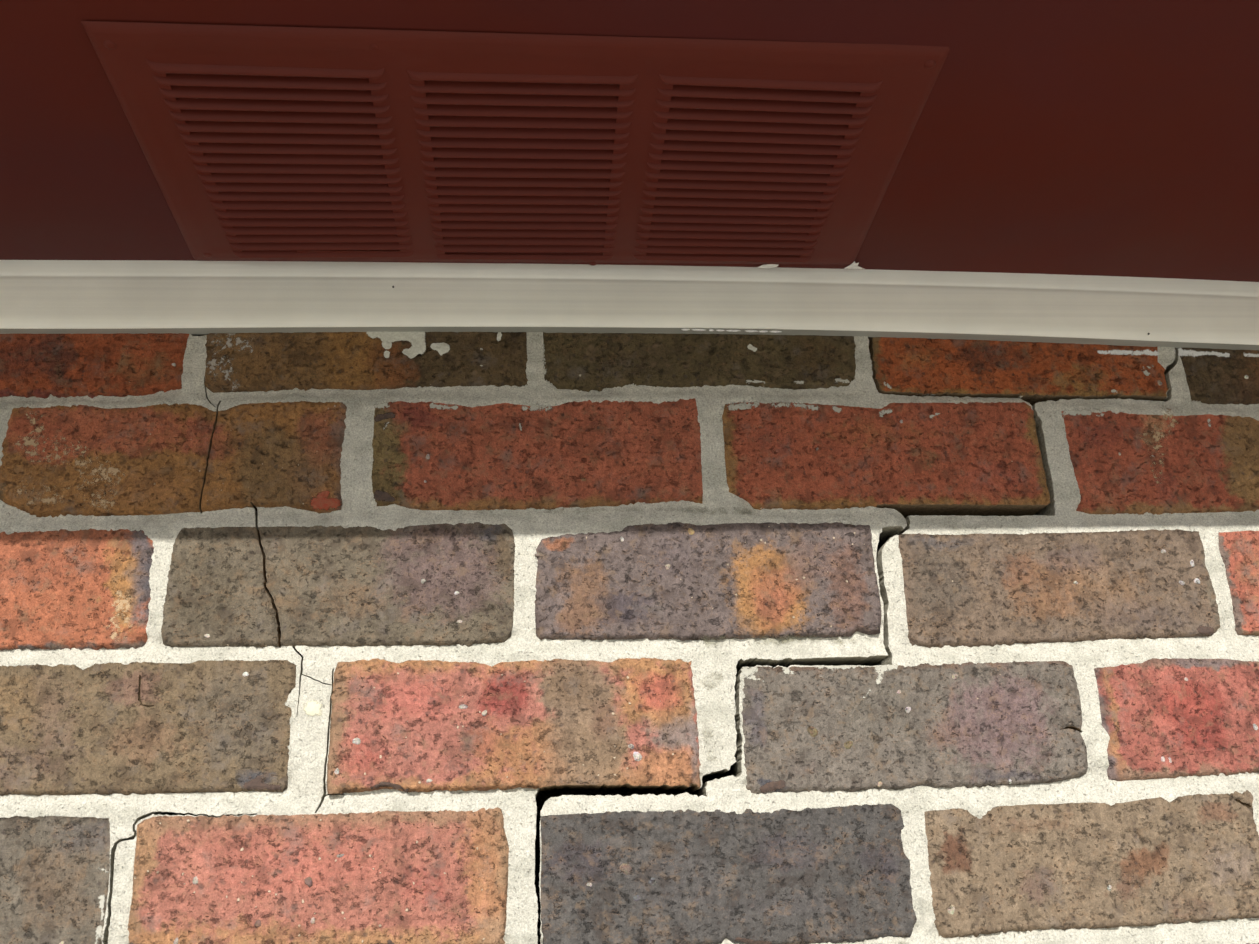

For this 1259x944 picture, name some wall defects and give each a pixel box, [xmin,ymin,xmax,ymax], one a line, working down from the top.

crack [199,376,221,514]
crack [250,501,344,813]
crack [534,337,1178,944]
crack [103,811,257,944]